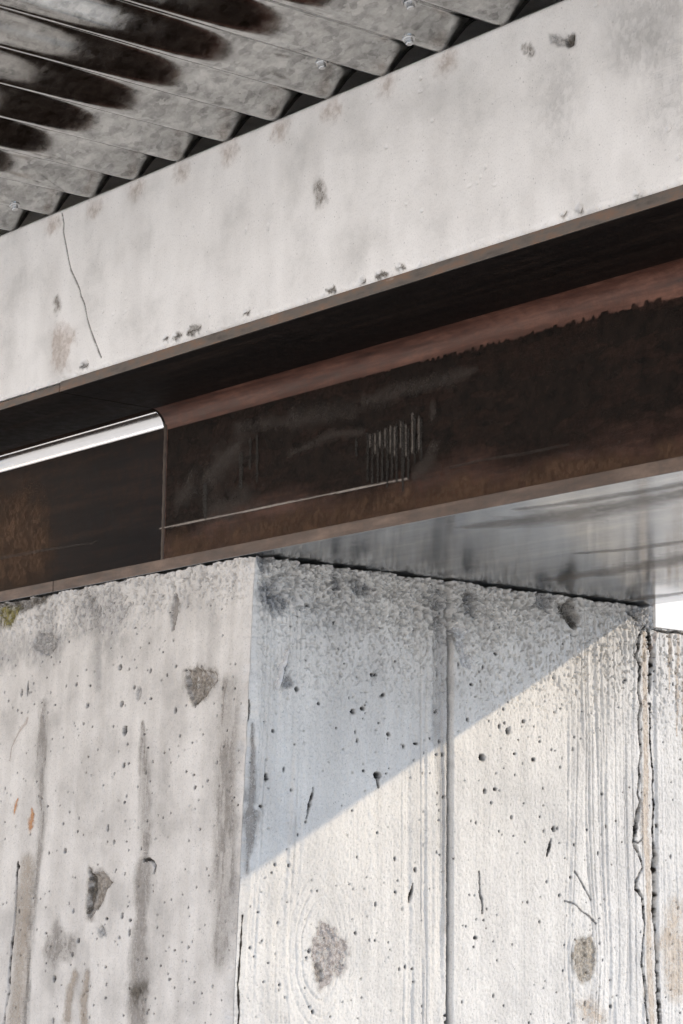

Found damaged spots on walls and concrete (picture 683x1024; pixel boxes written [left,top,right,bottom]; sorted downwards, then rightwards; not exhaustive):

crack [62,213,102,358]
rust [169,456,641,558]
spalling [185,666,218,705]
leakage [10,704,46,1024]
leakage [45,925,74,961]
leakage [65,971,89,1024]
spalling [87,873,113,919]
leakage [129,833,151,1024]
leakage [215,723,258,894]
spalling [311,923,347,989]
spalling [571,937,596,981]
crack [630,614,683,1024]